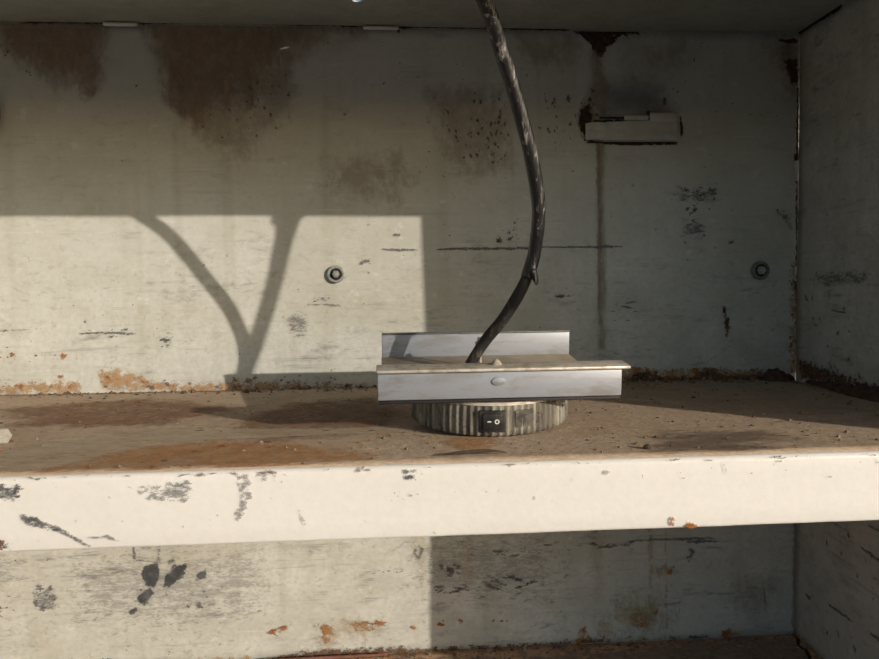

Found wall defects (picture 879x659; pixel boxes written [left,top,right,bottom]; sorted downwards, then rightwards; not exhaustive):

corrosion [574,31,639,57]
corrosion [544,88,683,151]
corrosion [788,260,875,388]
corrosion [0,369,377,431]
corrosion [622,367,763,381]
corrosion [49,398,404,478]
peeling [0,484,22,501]
peeling [130,559,187,615]
corrosion [268,609,708,659]